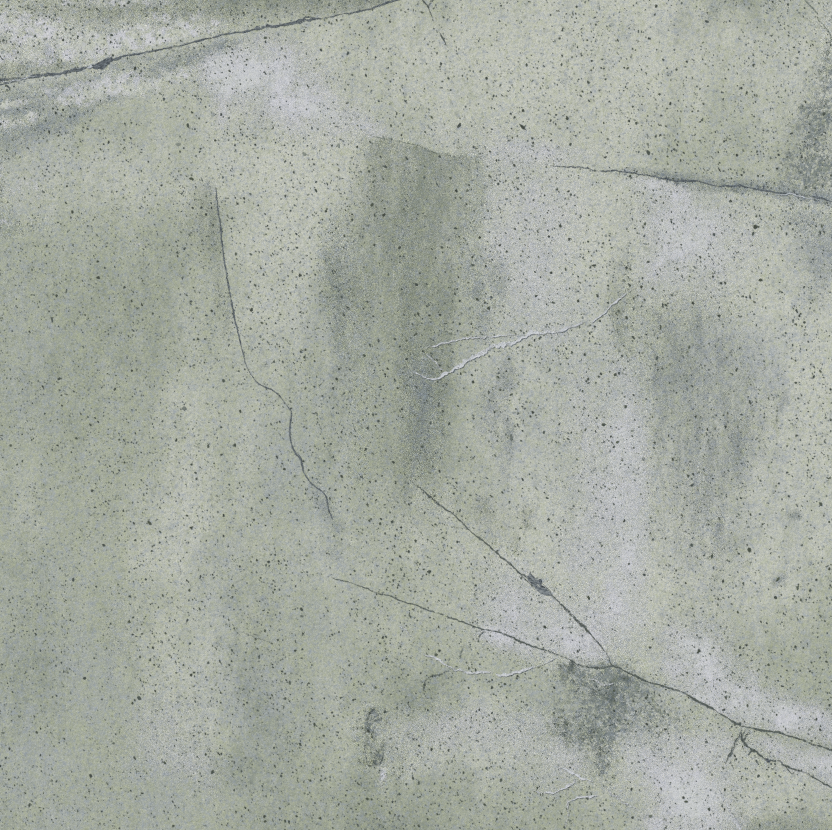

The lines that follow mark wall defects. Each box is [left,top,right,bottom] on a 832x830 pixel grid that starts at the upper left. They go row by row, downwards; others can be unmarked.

crack [0,0,397,90]
crack [537,163,832,209]
crack [215,185,332,518]
crack [331,482,832,787]